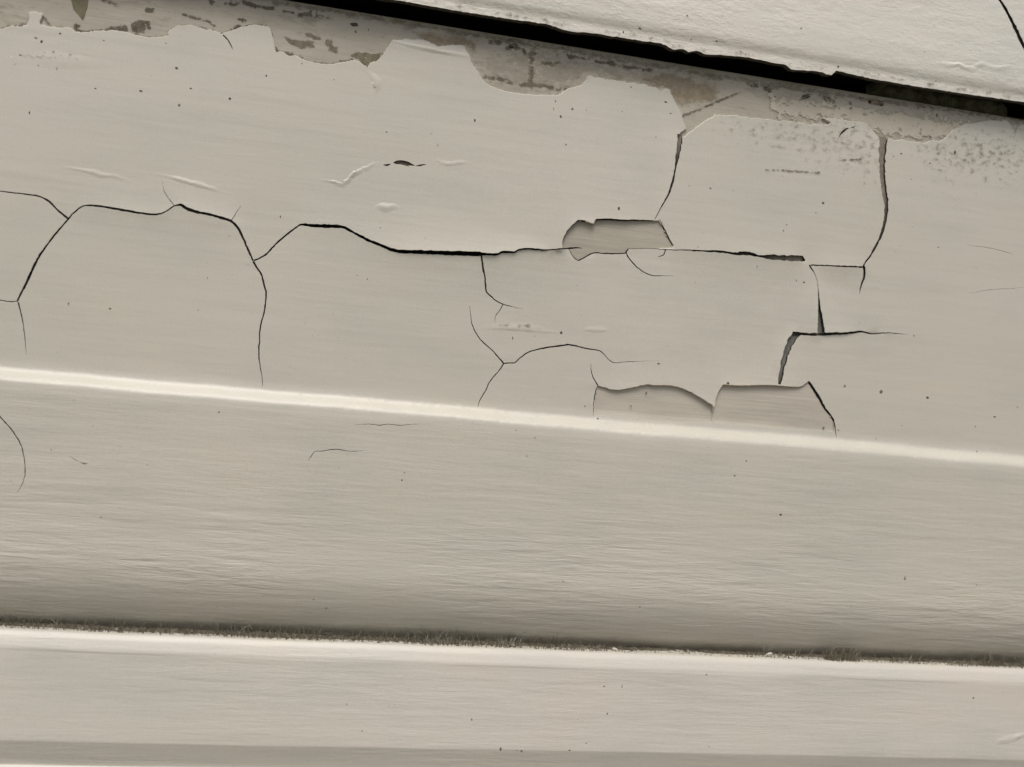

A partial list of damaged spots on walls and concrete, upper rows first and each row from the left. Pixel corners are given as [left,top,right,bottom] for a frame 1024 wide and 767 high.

peeling [0,0,1024,143]
crack [0,135,898,385]
peeling [562,220,673,260]
crack [471,322,639,404]
peeling [593,382,833,431]
crack [808,382,833,421]